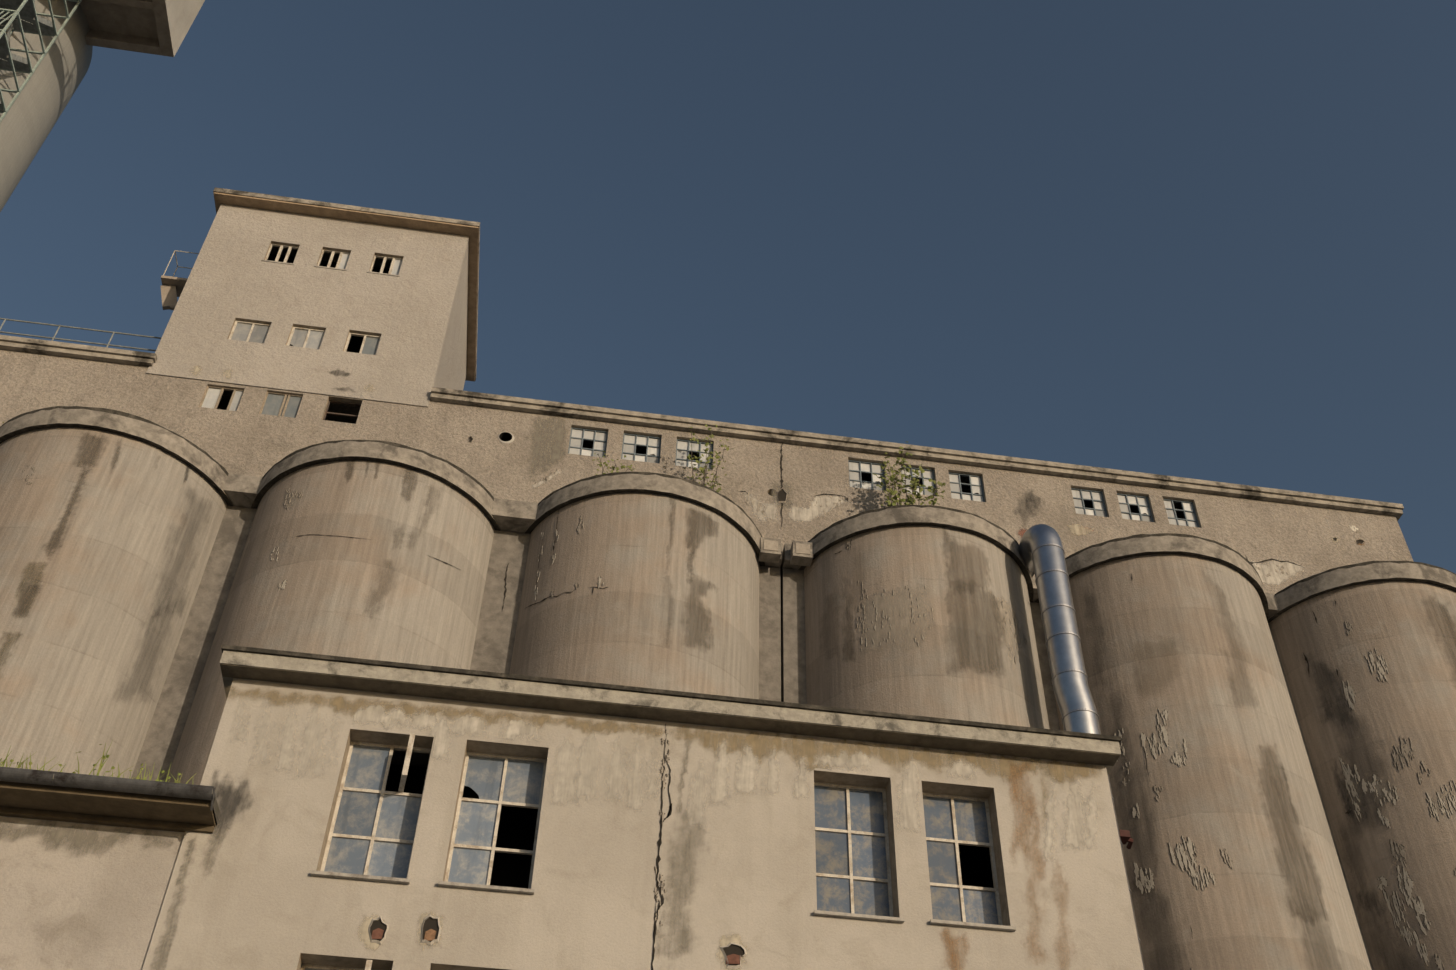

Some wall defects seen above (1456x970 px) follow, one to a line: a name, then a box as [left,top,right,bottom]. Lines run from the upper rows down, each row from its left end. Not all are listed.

water stain [687,510,713,551]
water stain [231,690,659,810]
spalling [1113,708,1188,801]
water stain [0,823,160,852]
water stain [214,783,246,834]
crack [651,724,672,970]
water stain [672,727,1098,950]
spalling [1133,862,1155,894]
spalling [1168,836,1233,891]
water stain [1266,751,1323,922]
spalling [1339,736,1456,970]